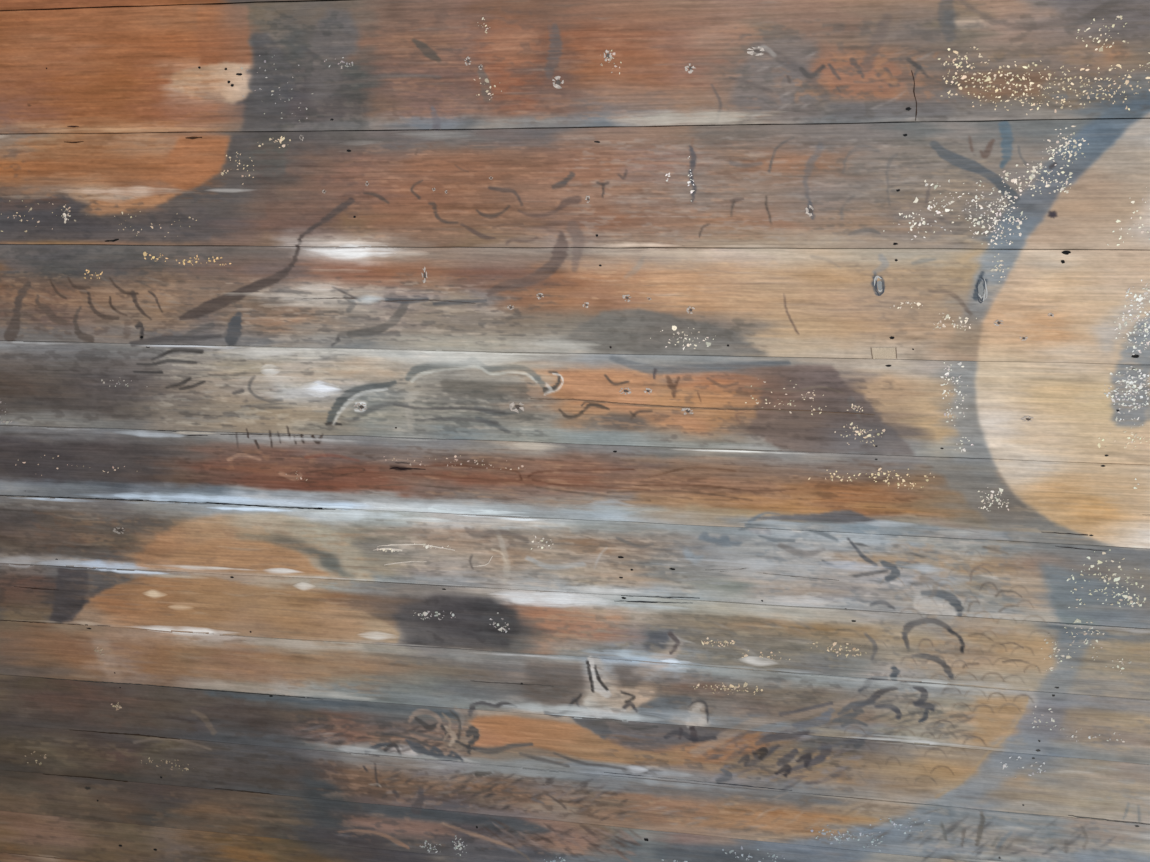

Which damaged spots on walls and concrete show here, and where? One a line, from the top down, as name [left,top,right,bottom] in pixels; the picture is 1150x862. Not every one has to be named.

damp [0,554,953,614]
damp [122,625,1039,693]